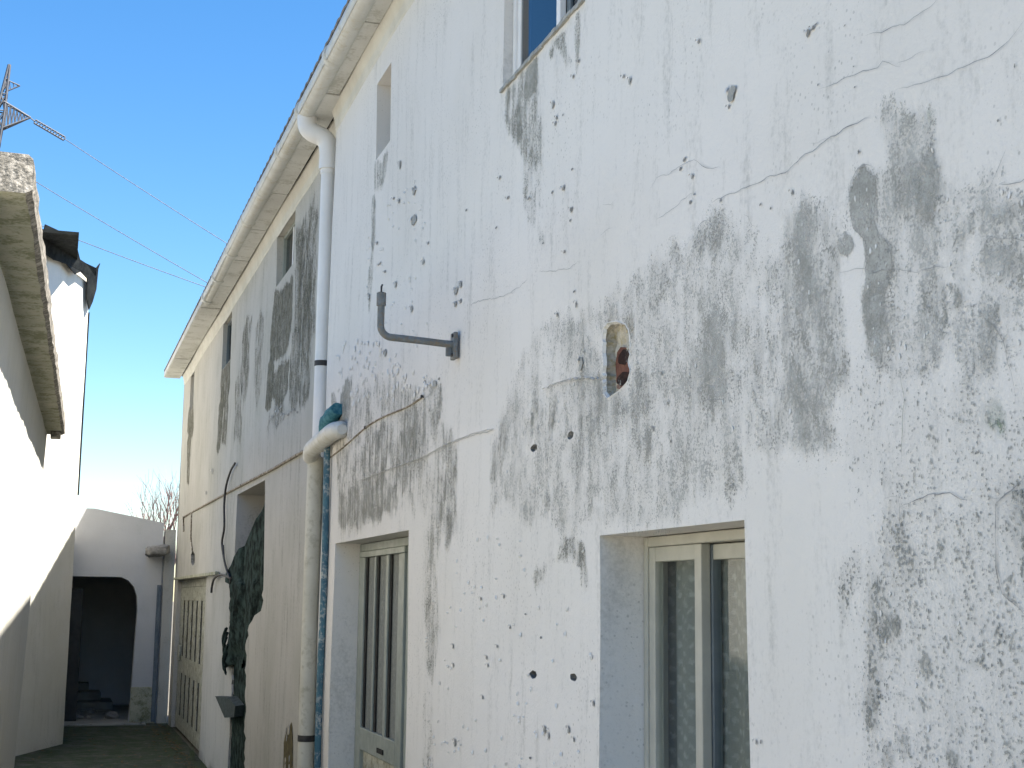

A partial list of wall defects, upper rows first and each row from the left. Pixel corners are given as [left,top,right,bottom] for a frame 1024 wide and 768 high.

damp [505,12,580,220]
crack [716,119,863,226]
crack [820,4,1020,89]
damp [217,194,318,453]
damp [331,374,457,675]
peeling [491,93,1024,768]